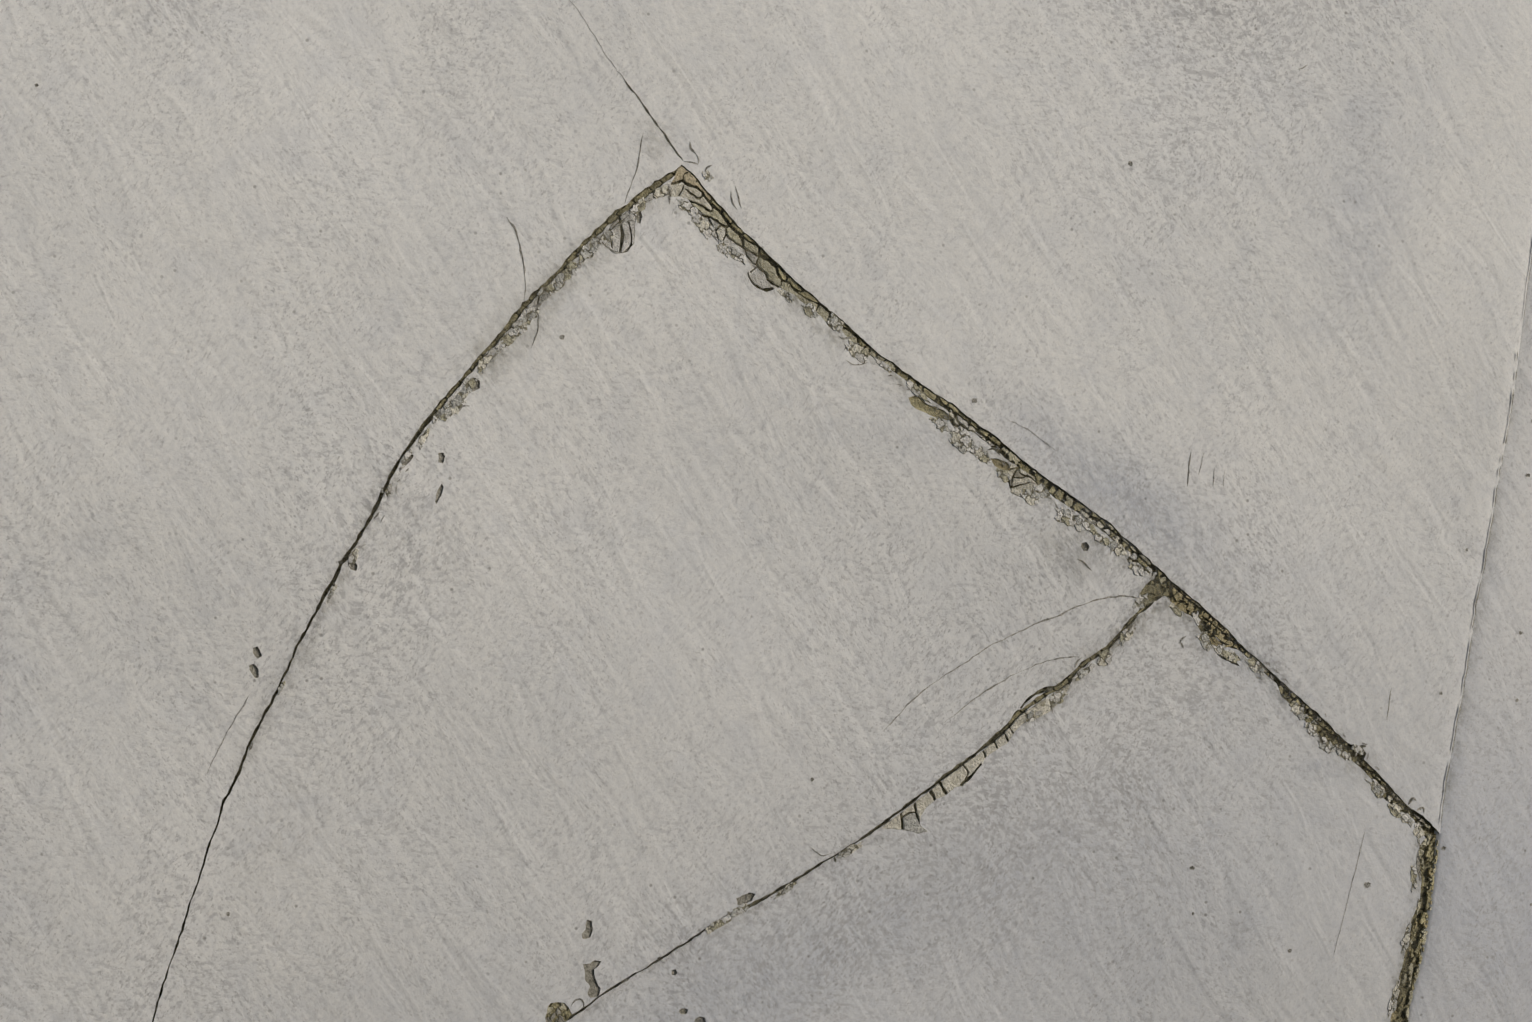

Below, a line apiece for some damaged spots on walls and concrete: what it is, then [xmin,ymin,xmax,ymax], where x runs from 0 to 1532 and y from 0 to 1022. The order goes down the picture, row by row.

crack [152,71,1439,1022]
crack [1441,514,1494,821]
crack [1495,371,1517,503]